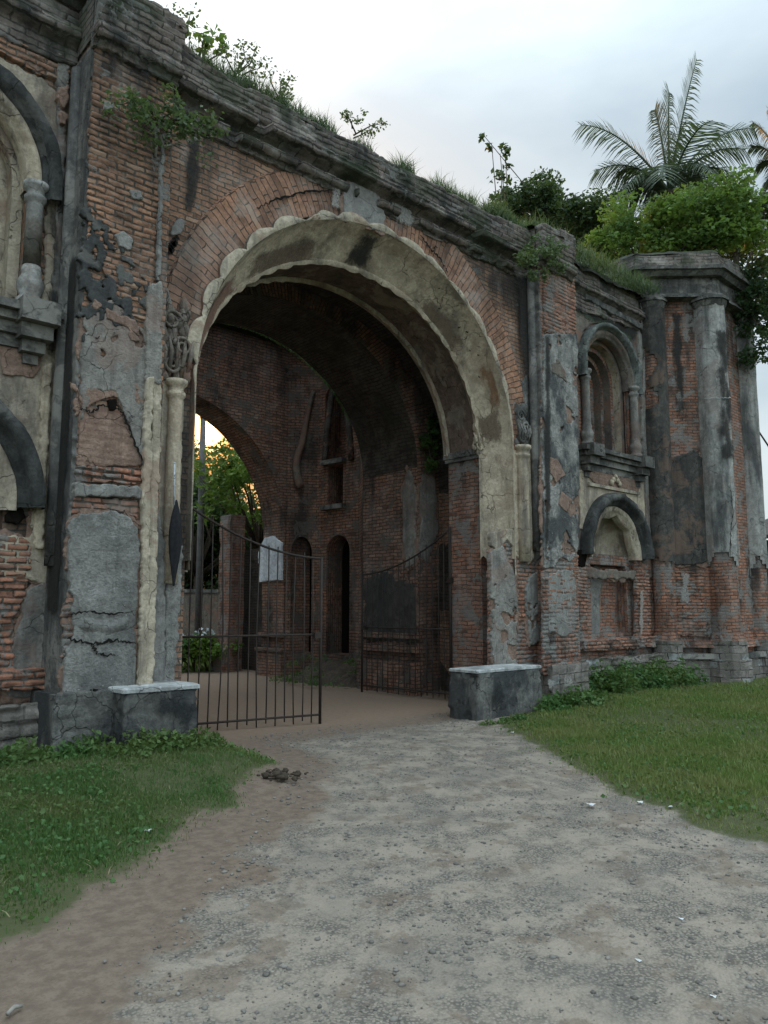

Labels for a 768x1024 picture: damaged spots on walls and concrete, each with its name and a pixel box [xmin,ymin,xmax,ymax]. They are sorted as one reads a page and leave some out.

spalling [86,48,185,342]
damp [185,139,200,212]
crack [257,189,335,209]
damp [345,234,377,267]
spalling [74,388,142,484]
flaking render [549,457,572,512]
spalling [0,508,32,670]
crack [67,610,136,657]